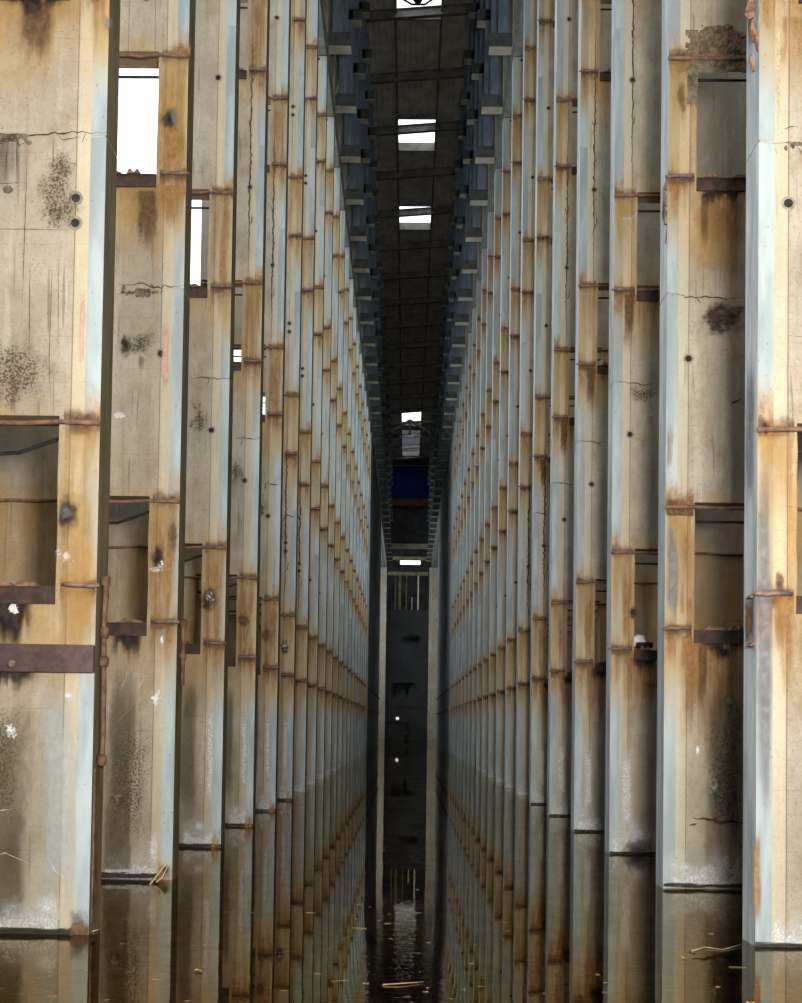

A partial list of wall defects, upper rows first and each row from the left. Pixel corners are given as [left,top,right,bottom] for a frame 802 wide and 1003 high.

crack [629,0,637,184]
crack [0,130,107,146]
rust [134,91,186,237]
damp [6,142,28,244]
crack [120,282,184,294]
crack [678,294,740,303]
crack [689,816,743,826]
damp [664,858,743,888]
damp [0,899,70,935]
damp [755,923,802,948]